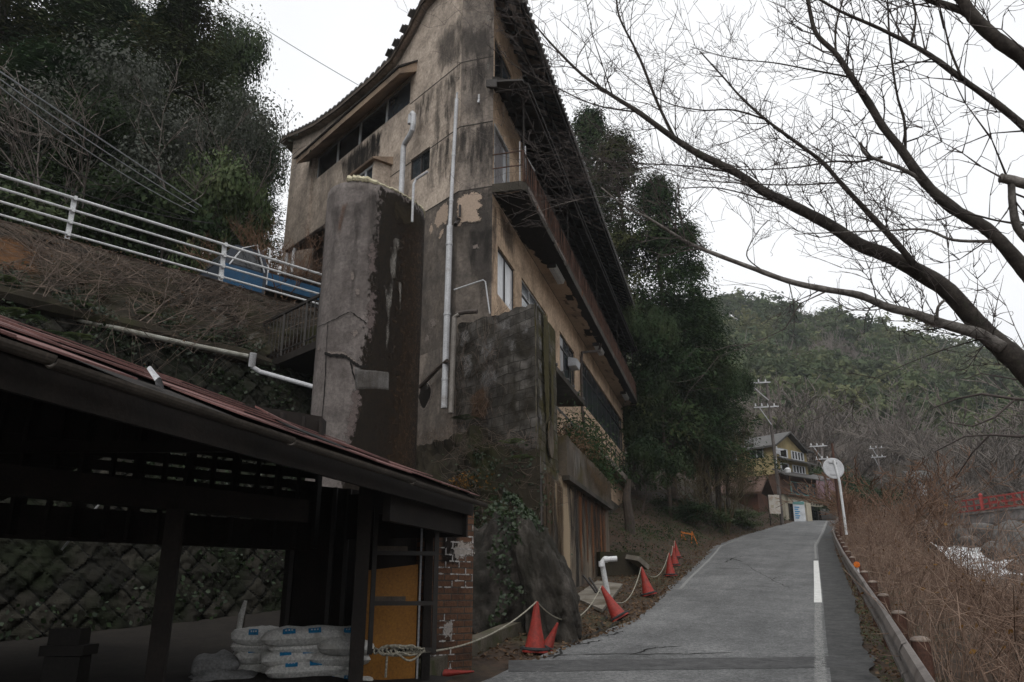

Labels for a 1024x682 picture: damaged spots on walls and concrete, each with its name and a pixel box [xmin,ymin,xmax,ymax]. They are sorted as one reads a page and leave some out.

damp [440,29,491,85]
damp [431,127,493,162]
peeling [429,192,484,239]
crack [317,312,368,414]